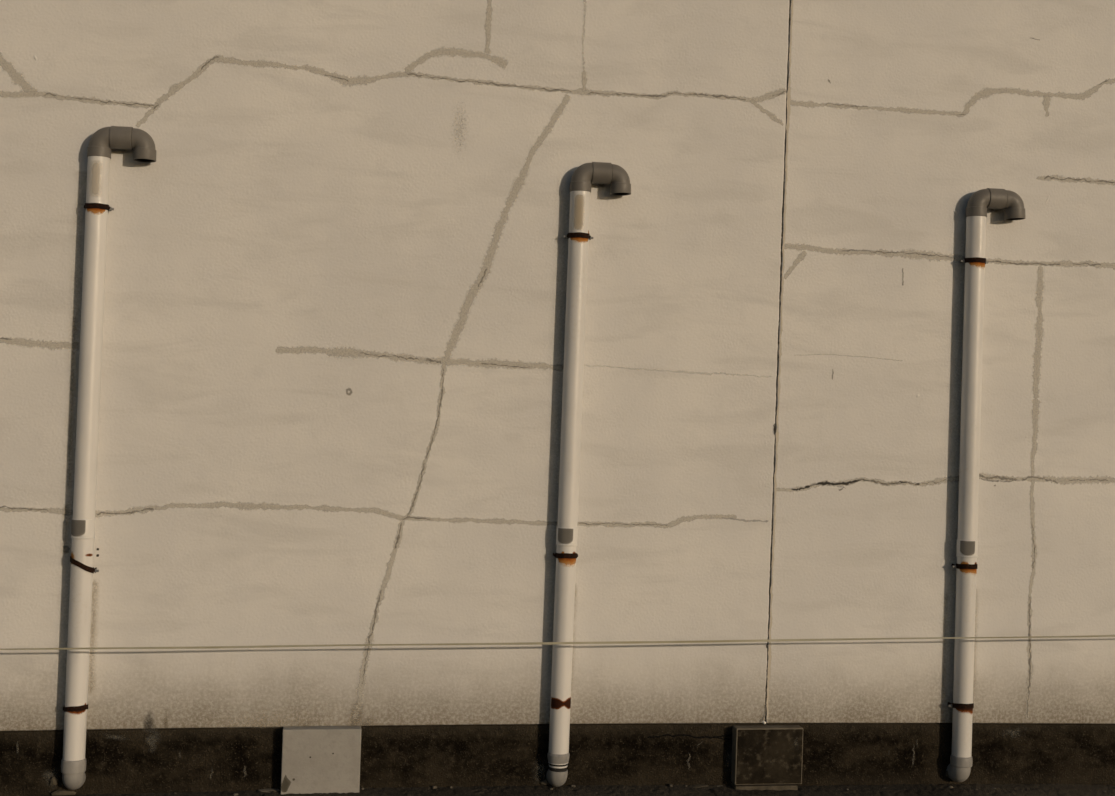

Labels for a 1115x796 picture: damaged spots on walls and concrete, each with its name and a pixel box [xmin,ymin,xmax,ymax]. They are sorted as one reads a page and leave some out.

crack [0,0,786,719]
crack [777,244,1115,719]
crack [790,79,1115,117]
crack [1037,175,1115,185]